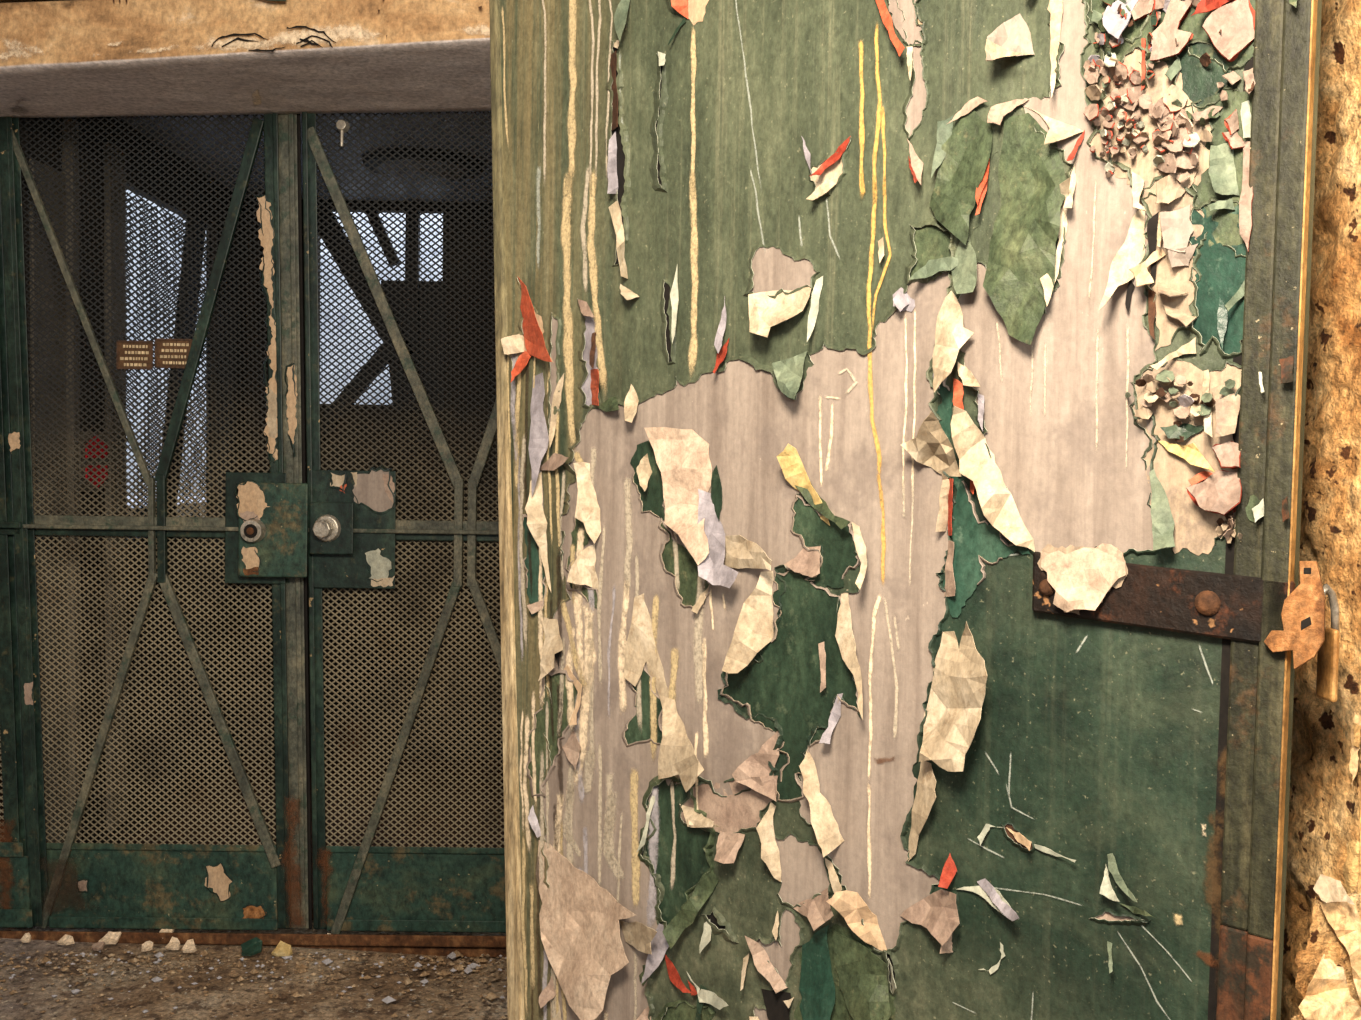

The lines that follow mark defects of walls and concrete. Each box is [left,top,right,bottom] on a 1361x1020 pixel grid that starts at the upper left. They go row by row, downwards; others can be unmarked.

peeling [235,480,270,522]
peeling [329,465,398,515]
peeling [501,0,1264,1020]
peeling [241,546,261,576]
peeling [365,548,395,587]
peeling [205,863,267,919]
peeling [241,937,293,957]
flaking render [1291,874,1361,1020]